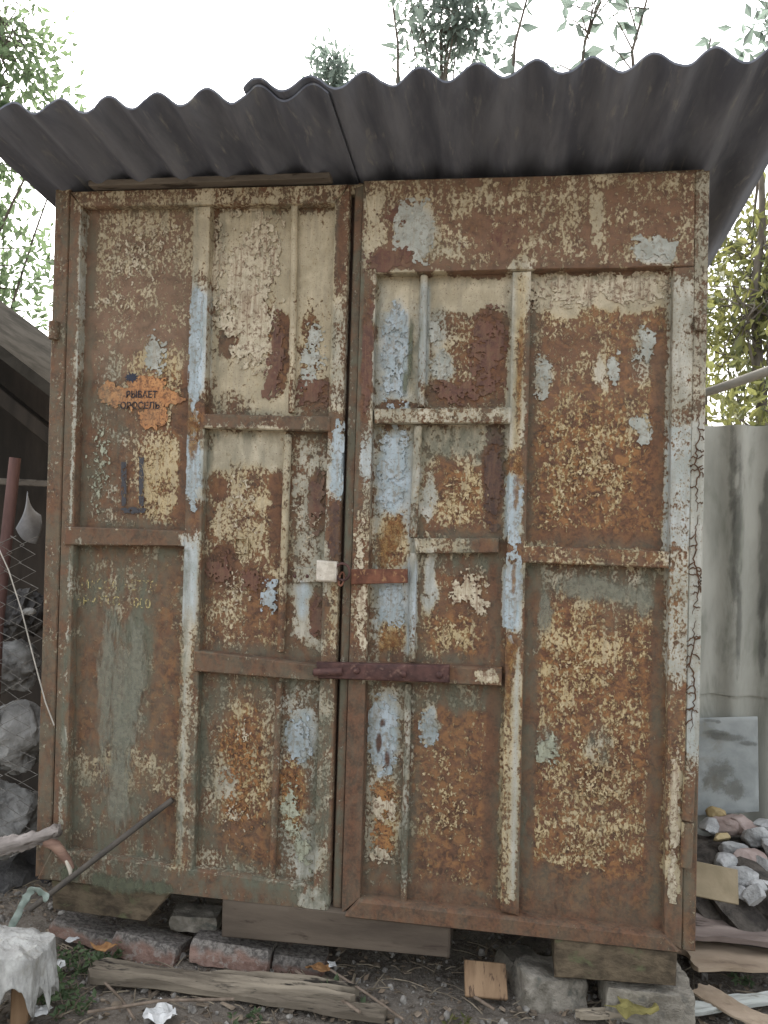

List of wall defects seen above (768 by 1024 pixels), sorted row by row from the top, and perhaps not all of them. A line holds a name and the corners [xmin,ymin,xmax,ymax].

peeling [392,197,435,266]
peeling [185,208,286,512]
peeling [299,322,327,388]
peeling [380,298,412,409]
peeling [427,319,456,380]
peeling [227,467,257,534]
peeling [330,418,345,501]
corrosion [483,425,524,532]
peeling [219,565,278,615]
corrosion [214,709,264,857]
corrosion [369,720,399,858]